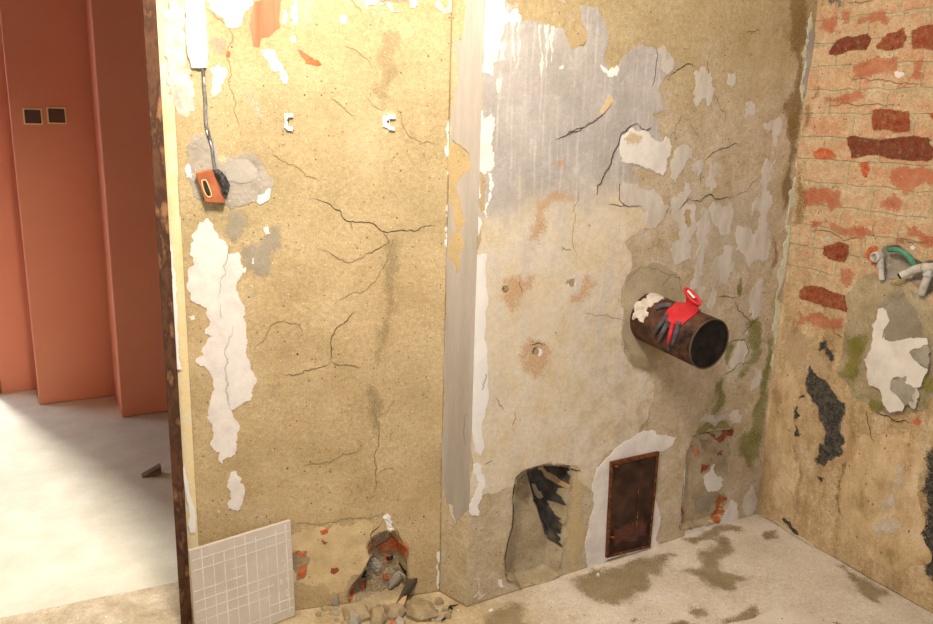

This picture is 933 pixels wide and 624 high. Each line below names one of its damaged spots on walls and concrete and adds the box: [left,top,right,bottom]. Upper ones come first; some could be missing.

flaking render [208,0,287,47]
flaking render [829,23,933,56]
crack [559,103,612,139]
flaking render [847,108,933,178]
crack [561,115,761,254]
crack [271,150,434,376]
peeling [187,218,257,464]
spalling [291,519,409,603]
water stain [564,551,679,606]
water stain [681,524,749,592]
water stain [669,607,709,624]
water stain [720,603,762,624]